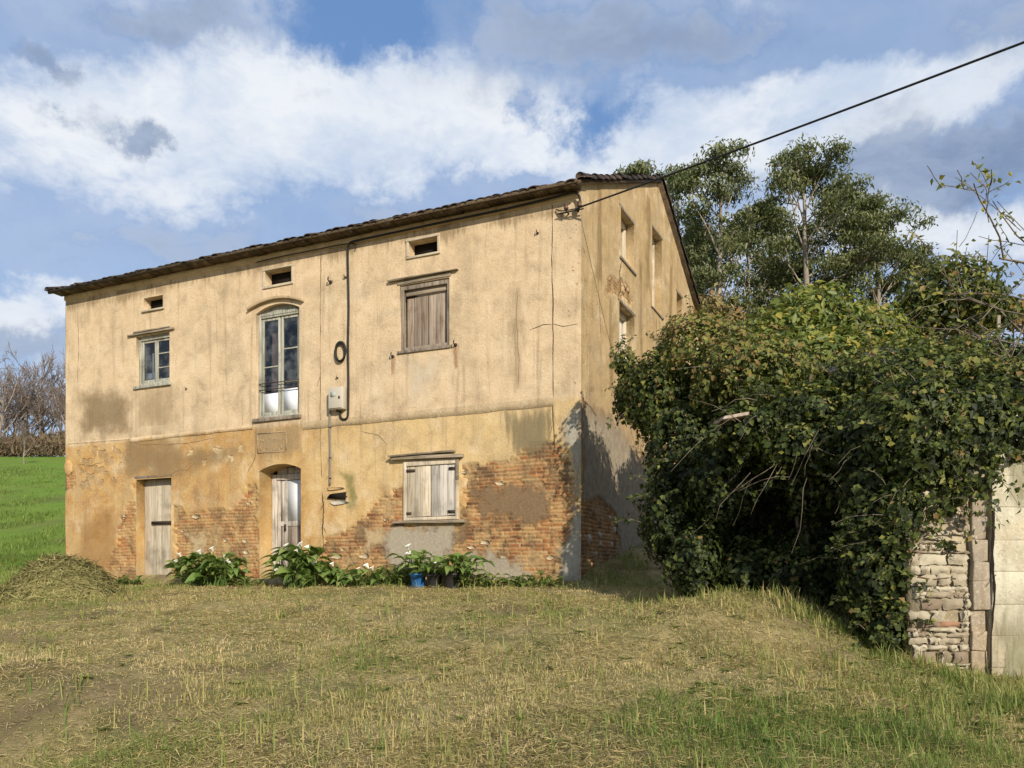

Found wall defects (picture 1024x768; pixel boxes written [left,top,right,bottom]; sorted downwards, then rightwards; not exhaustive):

crack [516,205,575,382]
peeling [66,445,127,491]
damp [83,396,125,430]
flaking render [106,486,136,579]
flaking render [173,484,259,579]
flaking render [319,442,620,581]
damp [507,414,551,453]
crack [548,382,556,447]